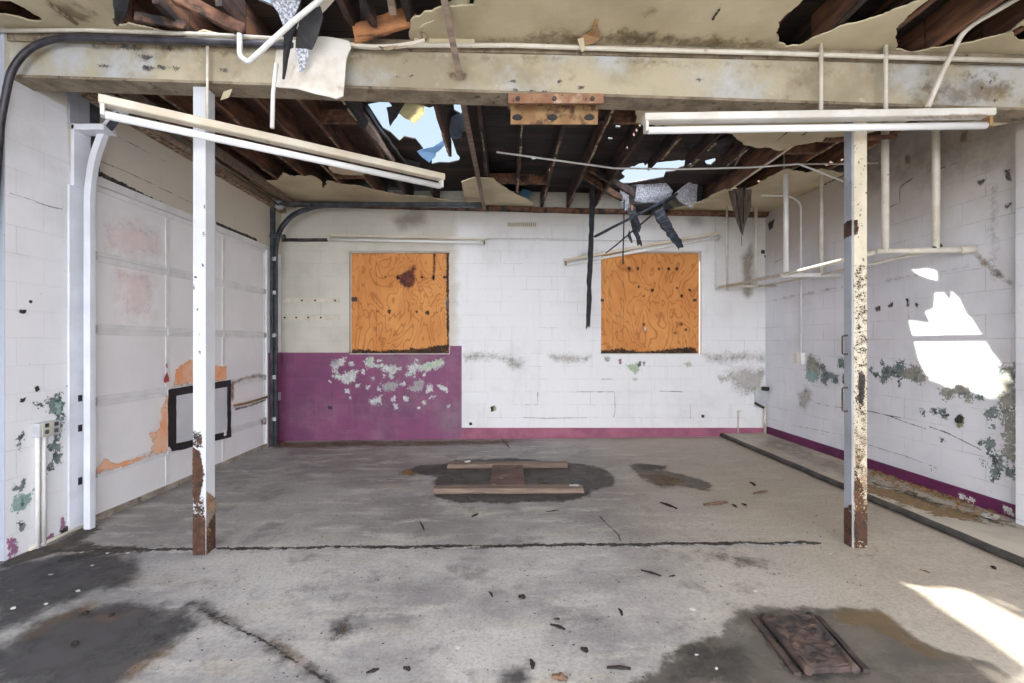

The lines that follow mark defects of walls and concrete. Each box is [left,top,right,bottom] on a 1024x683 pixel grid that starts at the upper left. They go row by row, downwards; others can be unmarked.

peeling [328,356,448,411]
peeling [800,353,844,406]
peeling [868,358,929,387]
peeling [20,386,67,471]
peeling [920,361,1016,483]
peeling [7,478,35,560]
rust [192,447,205,501]
rust [192,513,216,555]
crack [41,513,821,557]
leakage [632,464,711,491]
rust [844,457,868,548]
leakage [635,606,1009,683]